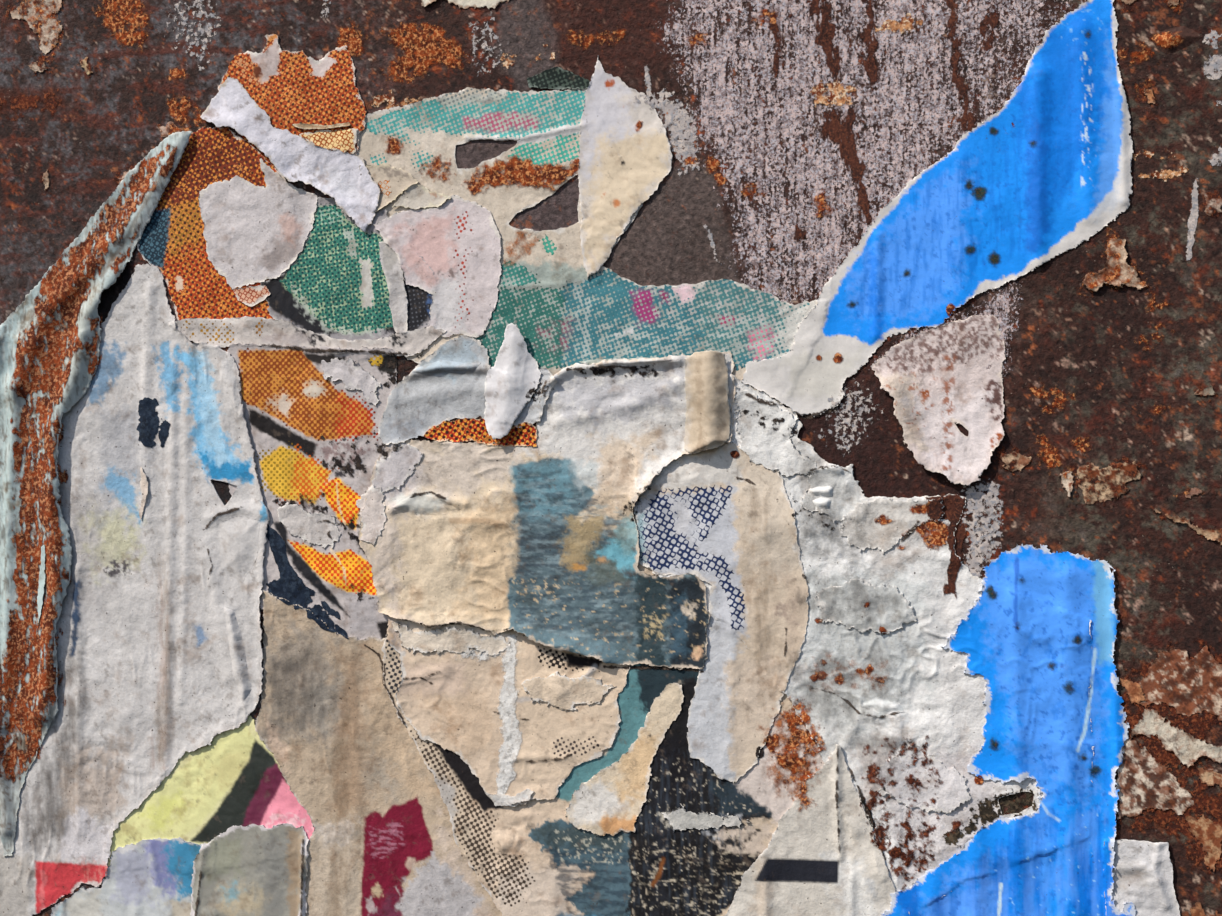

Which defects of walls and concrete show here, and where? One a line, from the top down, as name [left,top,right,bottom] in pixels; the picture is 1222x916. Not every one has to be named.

corrosion [95,0,153,47]
peeling [1140,81,1157,105]
corrosion [386,136,403,154]
corrosion [465,155,580,195]
peeling [634,0,1086,304]
corrosion [1133,150,1189,182]
peeling [1198,190,1222,219]
peeling [1082,234,1148,293]
peeling [895,283,1023,373]
corrosion [0,144,177,783]
peeling [960,445,1032,577]
corrosion [755,698,826,810]